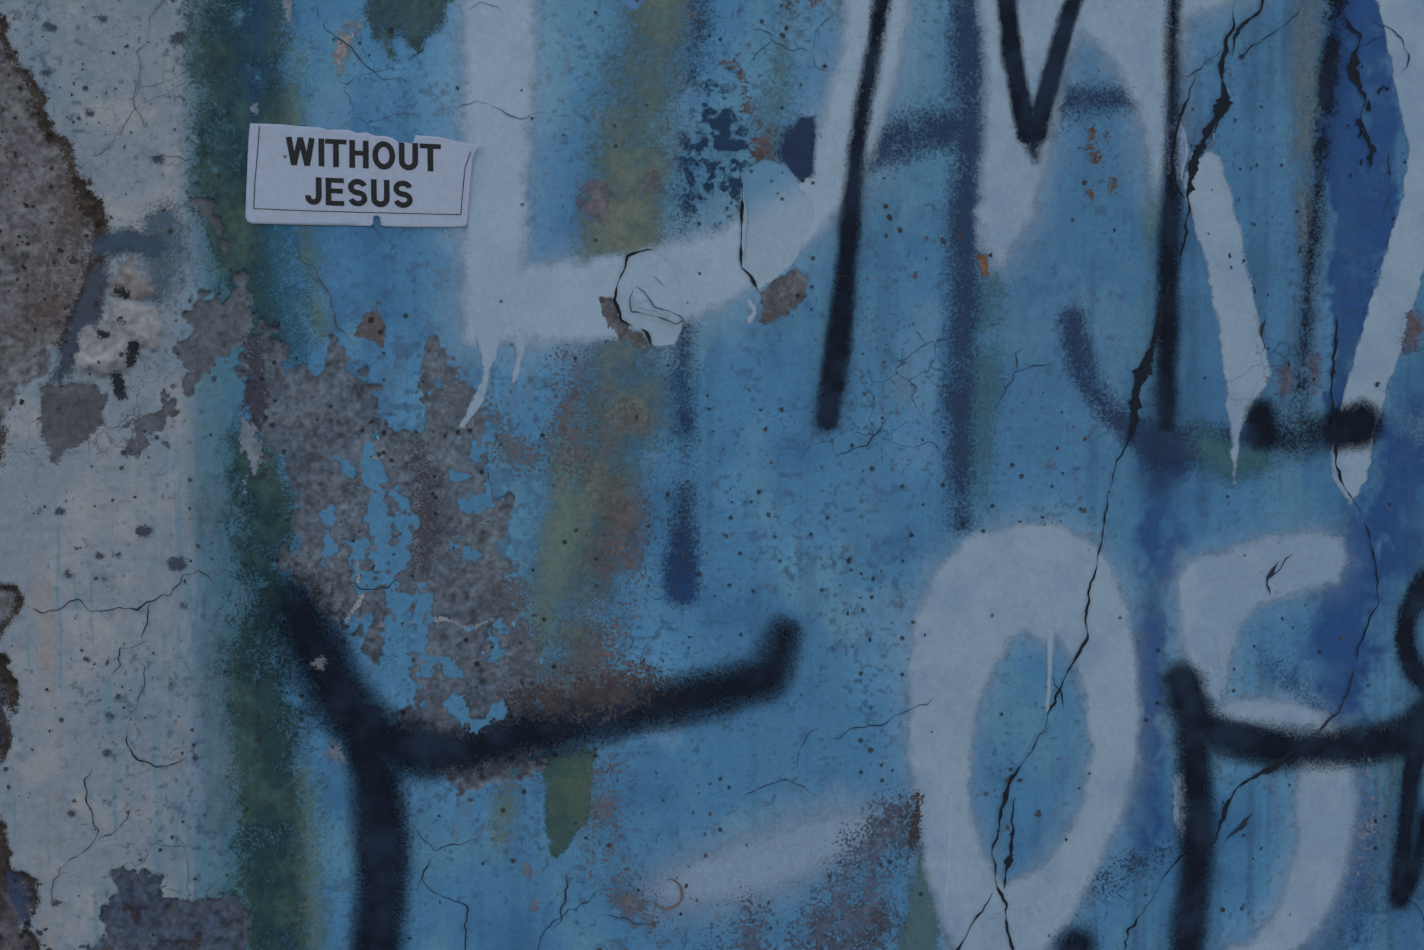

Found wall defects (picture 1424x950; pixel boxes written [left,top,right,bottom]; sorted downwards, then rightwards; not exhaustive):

peeling [280,0,293,25]
crack [1344,18,1410,210]
spalling [0,12,128,471]
peeling [599,249,688,350]
peeling [739,155,815,325]
crack [837,413,941,456]
crack [956,0,1300,950]
spalling [0,581,25,763]
peeling [119,270,929,950]
crack [1117,318,1379,950]
spalling [0,814,52,950]
peeling [73,865,253,950]